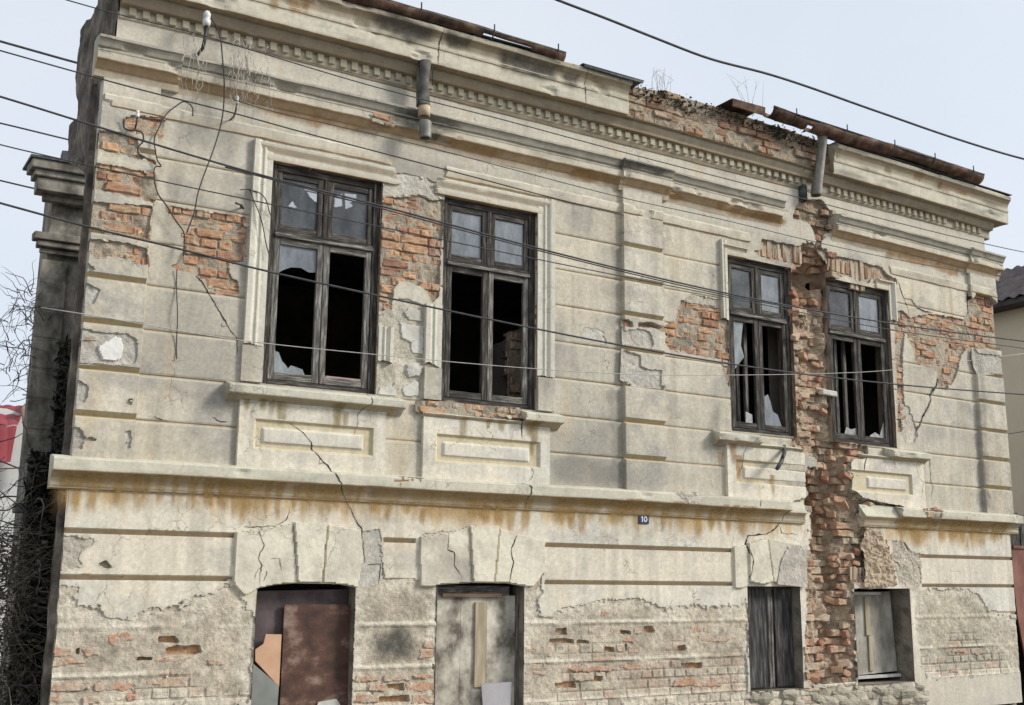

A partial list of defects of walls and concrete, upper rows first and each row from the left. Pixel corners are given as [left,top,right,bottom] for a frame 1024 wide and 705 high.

flaking render [622,87,830,171]
flaking render [84,115,249,306]
flaking render [79,329,140,366]
flaking render [374,174,445,401]
flaking render [620,293,729,389]
flaking render [894,295,1002,443]
flaking render [49,579,255,705]
crack [245,511,290,580]
crack [294,426,381,579]
flaking render [523,528,1020,705]